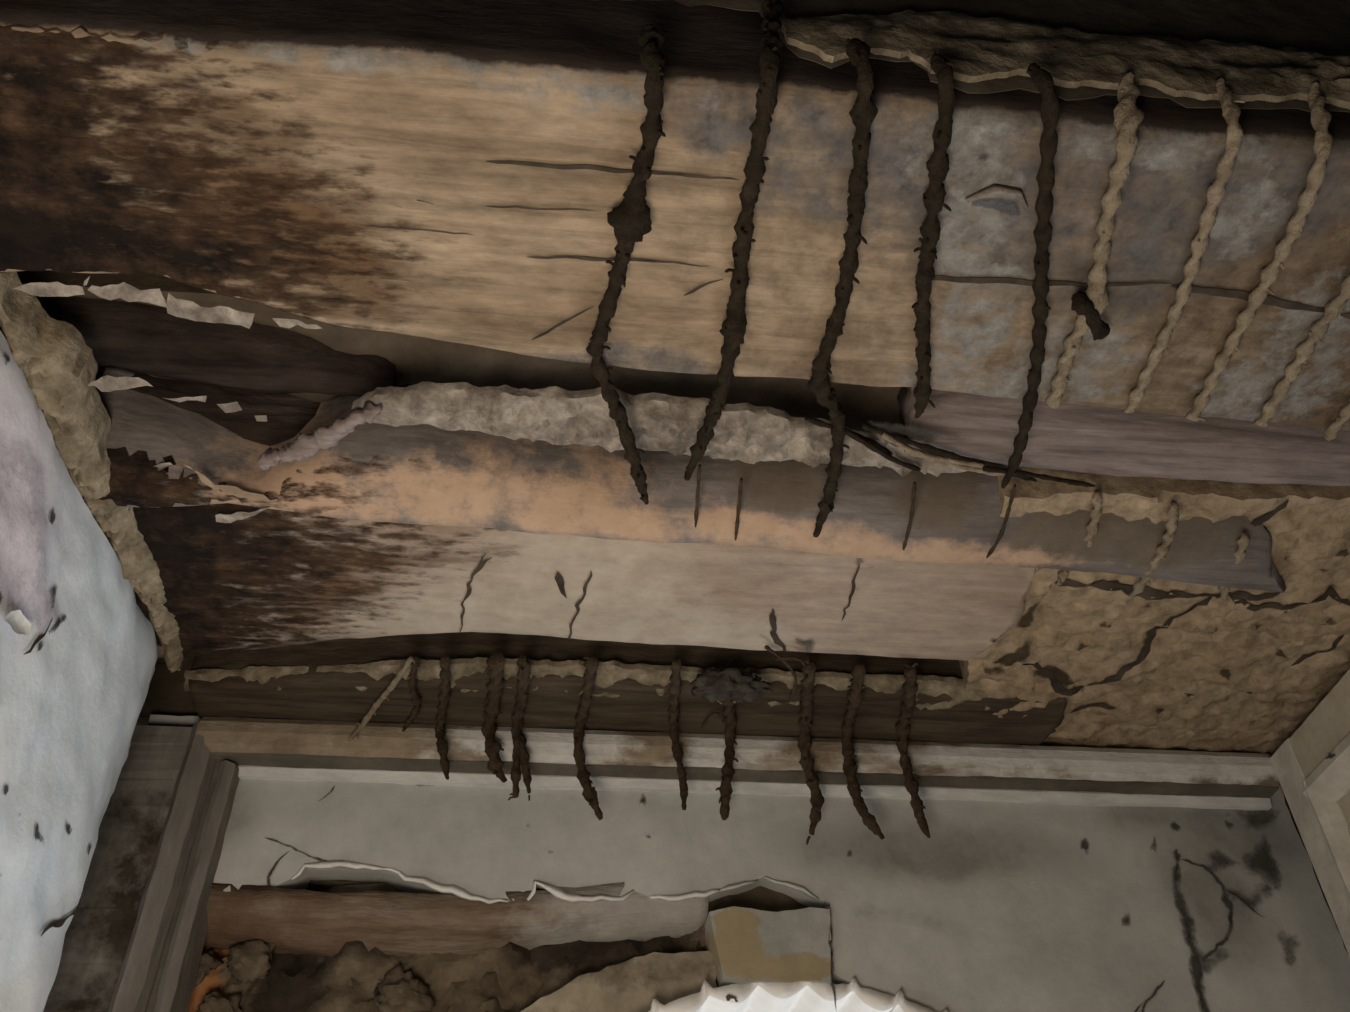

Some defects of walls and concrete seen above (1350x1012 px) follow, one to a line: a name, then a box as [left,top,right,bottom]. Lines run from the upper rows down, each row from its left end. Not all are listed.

flaking render [779,0,1350,112]
leakage [0,25,422,330]
flaking render [272,318,322,329]
spalling [0,271,267,673]
flaking render [153,462,278,523]
spalling [352,382,1021,477]
crack [1251,500,1289,526]
spalling [984,605,1074,686]
crack [1023,579,1350,713]
flaking render [291,861,509,904]
flaking render [187,876,819,1012]
crack [1134,849,1265,1012]